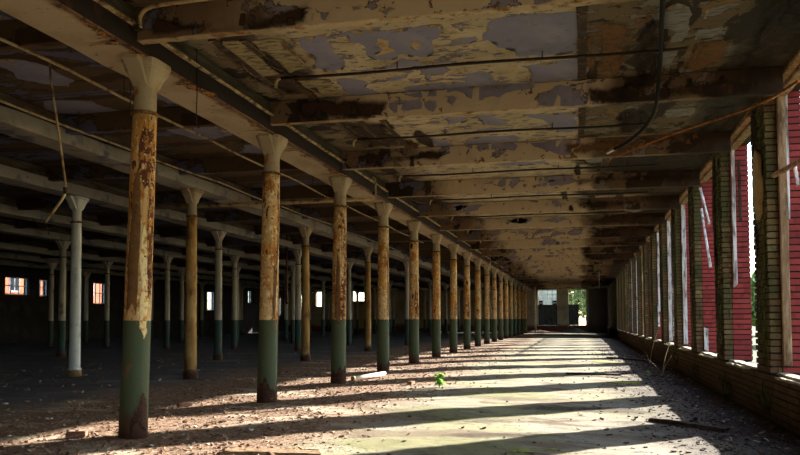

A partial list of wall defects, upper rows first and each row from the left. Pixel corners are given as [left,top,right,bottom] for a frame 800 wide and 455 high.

water stain [152,18,198,34]
water stain [239,8,305,28]
peeling [222,33,378,98]
peeling [344,0,589,155]
water stain [589,20,658,103]
peeling [658,3,724,71]
water stain [253,45,444,181]
peeling [434,135,549,166]
corrosion [124,117,155,312]
peeling [506,217,582,257]
corrosion [334,221,347,324]